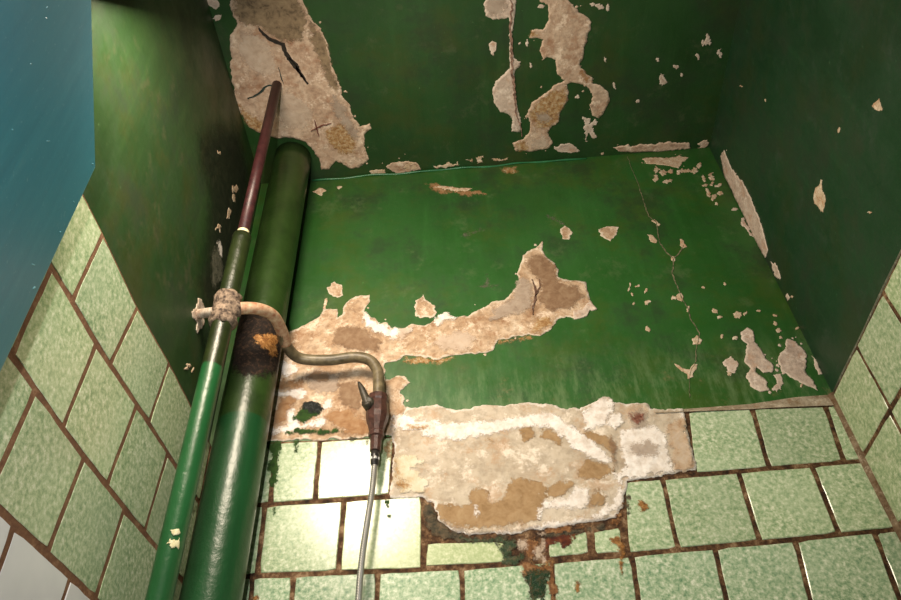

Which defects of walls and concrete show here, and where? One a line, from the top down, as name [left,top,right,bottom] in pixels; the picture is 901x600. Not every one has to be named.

crack [247,28,309,99]
peeling [207,0,421,174]
peeling [483,0,610,153]
peeling [434,156,508,169]
peeling [599,140,781,279]
peeling [813,180,826,212]
flaking render [267,241,697,535]
peeling [723,327,823,394]
water stain [421,502,624,600]
rust [543,525,584,561]